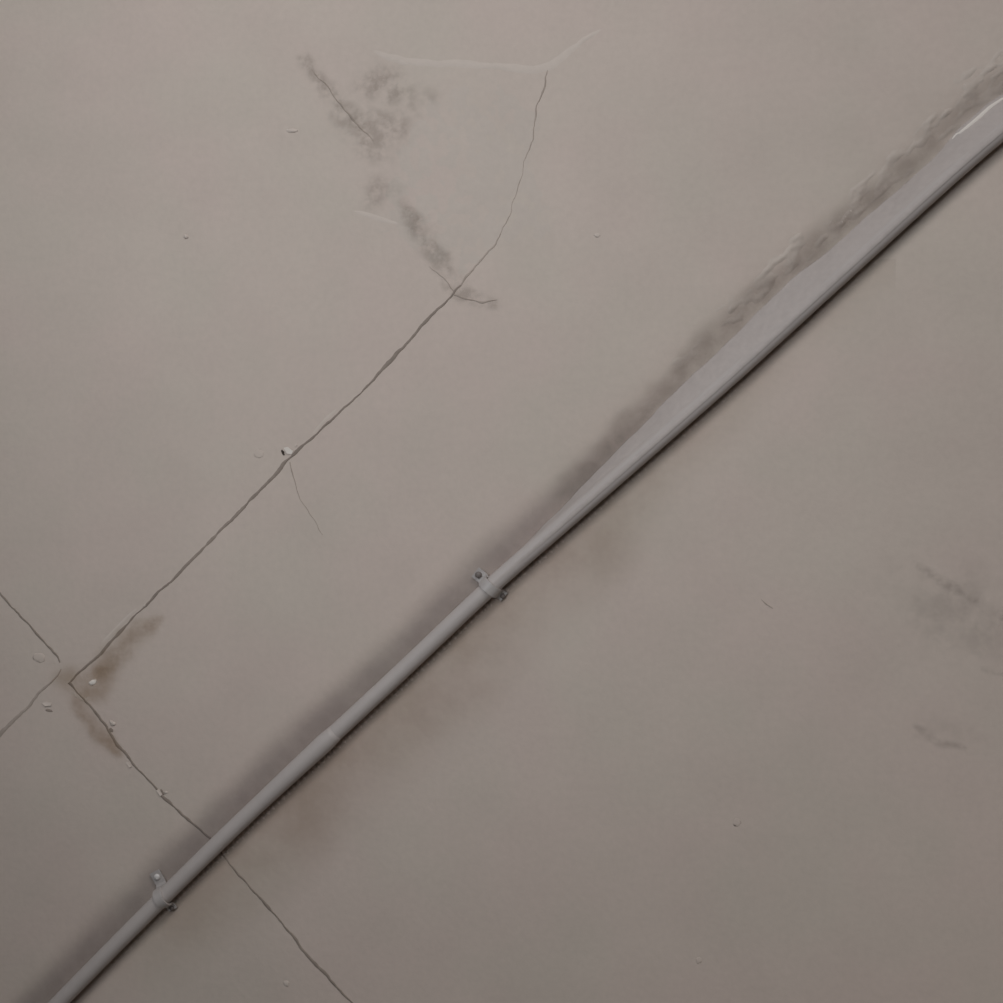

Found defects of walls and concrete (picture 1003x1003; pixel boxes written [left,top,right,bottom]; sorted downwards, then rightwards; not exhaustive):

crack [0,70,548,1003]